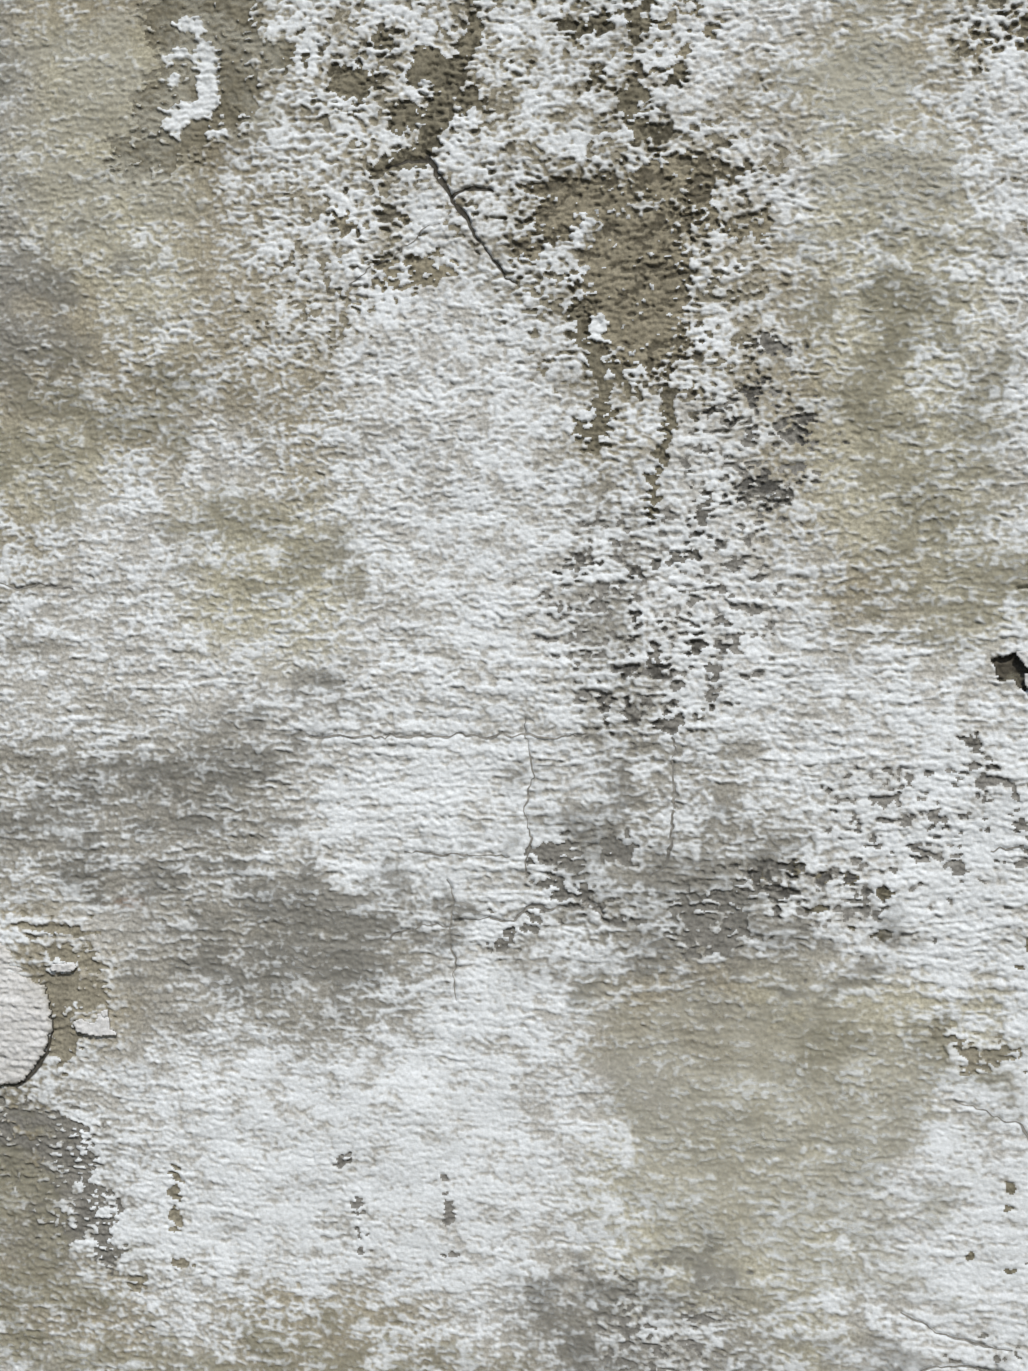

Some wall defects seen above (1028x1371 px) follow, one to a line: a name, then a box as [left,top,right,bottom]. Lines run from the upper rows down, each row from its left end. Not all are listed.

crack [349,154,518,285]
peeling [102,0,834,750]
spalling [991,651,1028,691]
peeling [11,911,118,1076]
peeling [929,1025,1028,1076]
damp [612,984,949,1290]
crack [955,1101,1028,1139]
peeling [1003,1181,1017,1212]
damp [527,1275,561,1316]
damp [586,1279,679,1313]
damp [573,1337,641,1371]